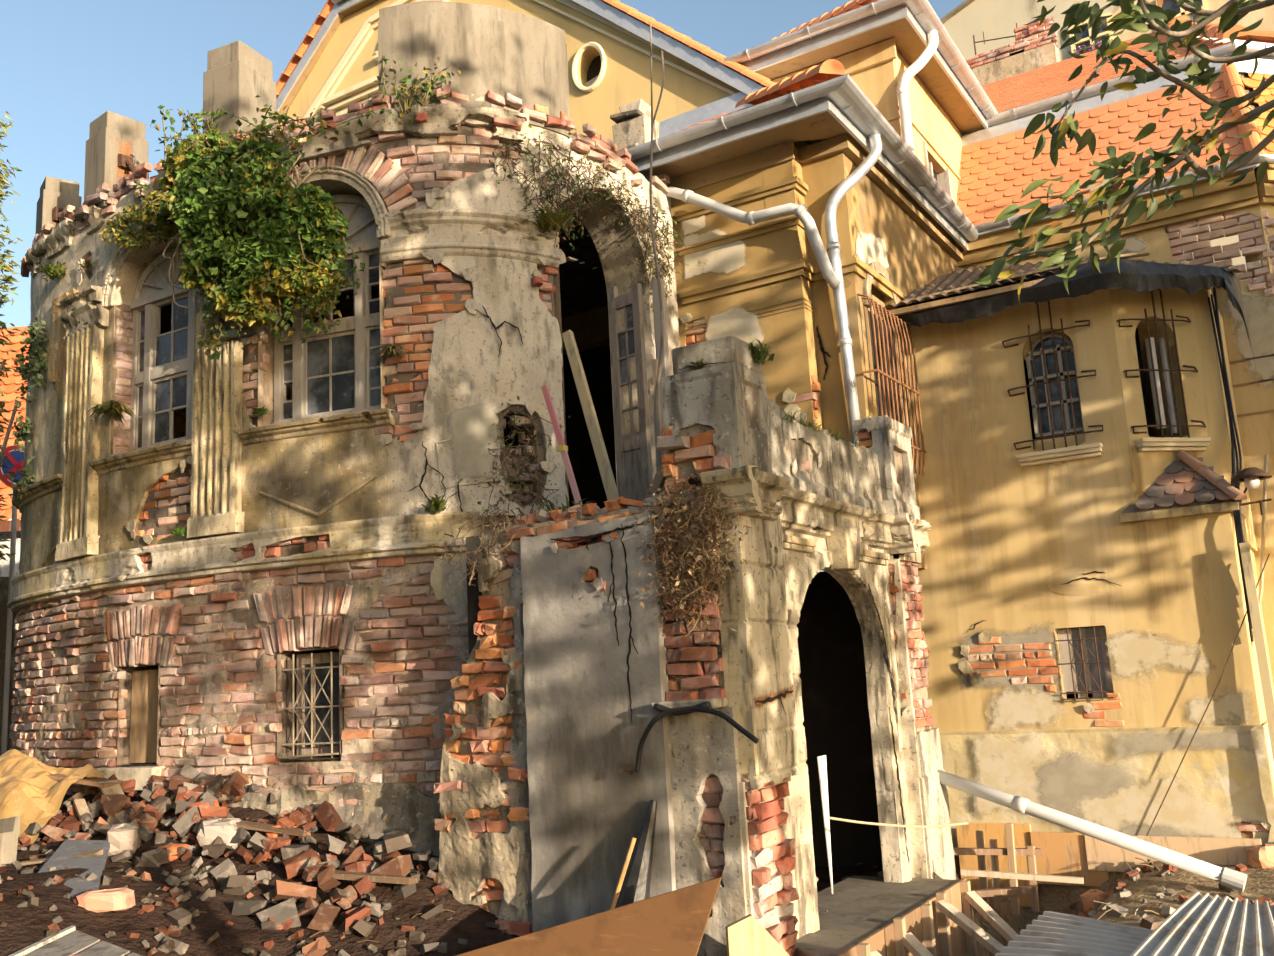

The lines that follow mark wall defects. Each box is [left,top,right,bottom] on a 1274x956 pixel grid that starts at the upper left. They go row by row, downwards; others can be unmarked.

flaking render [1101,0,1156,41]
spalling [374,248,481,446]
crack [475,306,523,357]
spalling [126,456,192,572]
crack [550,518,658,722]
spalling [958,628,1064,730]
peeling [1107,633,1211,677]
spalling [1082,692,1125,727]
peeling [1189,691,1250,726]
spalling [498,561,533,933]
spalling [1229,815,1271,838]